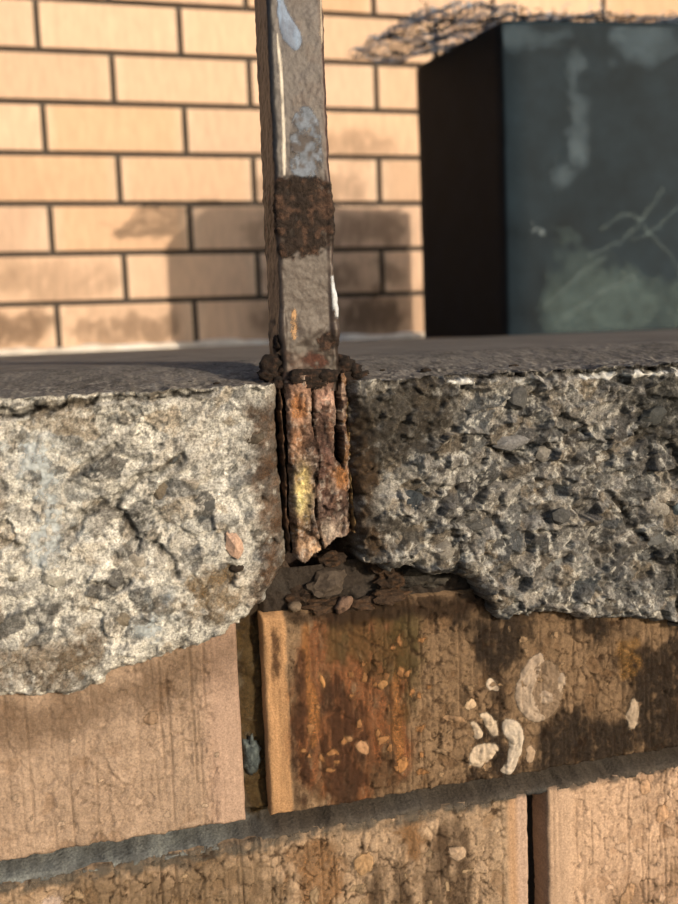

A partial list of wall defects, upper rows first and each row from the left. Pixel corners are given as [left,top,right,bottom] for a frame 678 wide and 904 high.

corrosion [276,389,291,552]
corrosion [348,471,356,533]
corrosion [272,633,280,676]
leakage [307,674,325,724]
peeling [348,662,411,687]
leakage [323,595,678,780]
peeling [300,736,347,772]
corrosion [292,674,369,803]
peeling [375,729,392,753]